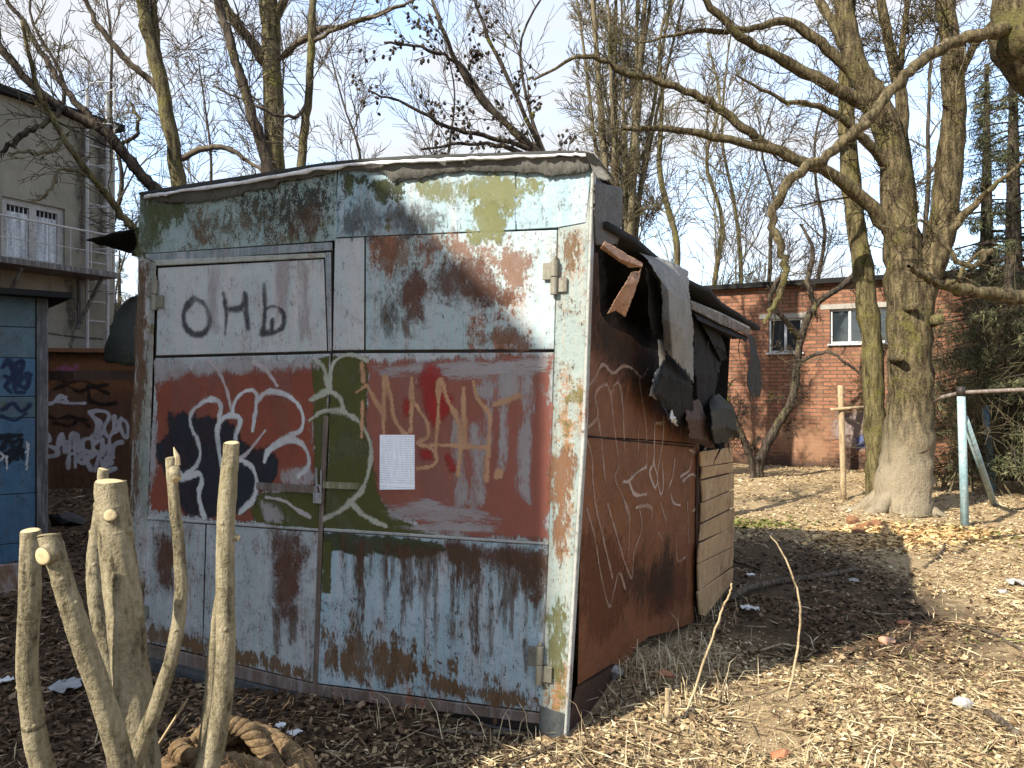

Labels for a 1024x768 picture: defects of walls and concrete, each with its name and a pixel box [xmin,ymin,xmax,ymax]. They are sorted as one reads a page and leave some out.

corrosion [366,232,539,338]
corrosion [467,324,532,352]
corrosion [155,534,174,592]
corrosion [235,446,578,724]
corrosion [147,623,170,647]
corrosion [182,634,208,657]